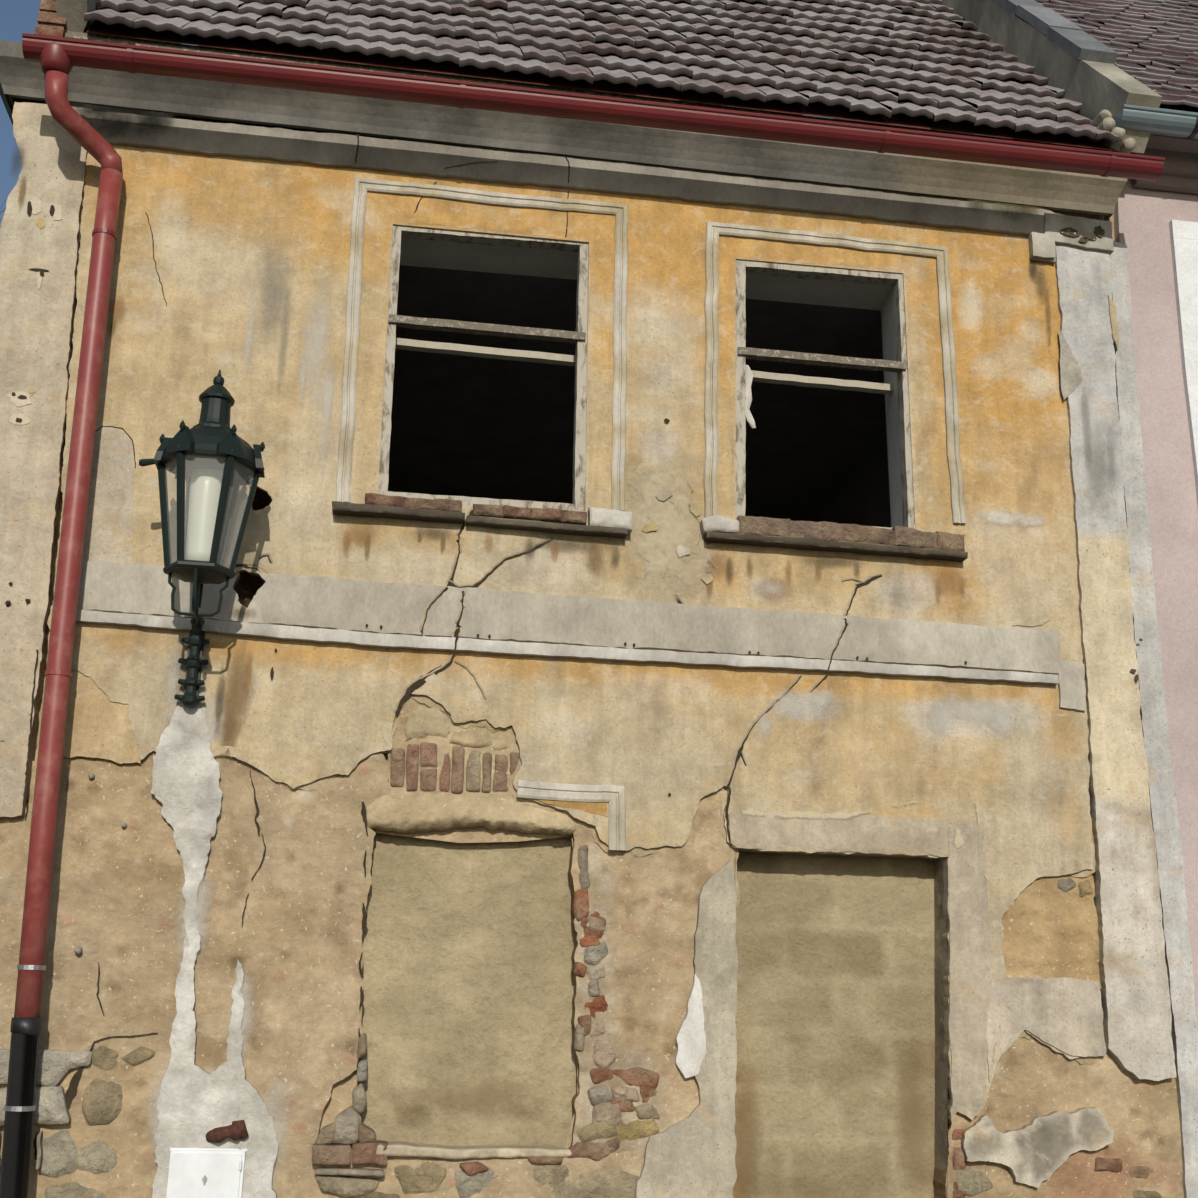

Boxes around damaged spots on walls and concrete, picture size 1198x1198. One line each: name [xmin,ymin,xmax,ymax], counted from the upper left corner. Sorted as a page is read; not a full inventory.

spalling [30,268,49,289]
spalling [27,197,62,228]
crack [145,212,167,306]
spalling [1060,225,1105,242]
peeling [1108,295,1119,351]
crack [394,508,553,714]
crack [724,573,882,845]
crack [242,774,266,925]
spalling [0,761,37,1171]
spalling [27,690,740,1198]
spalling [1001,875,1102,989]
spalling [934,1037,1184,1198]